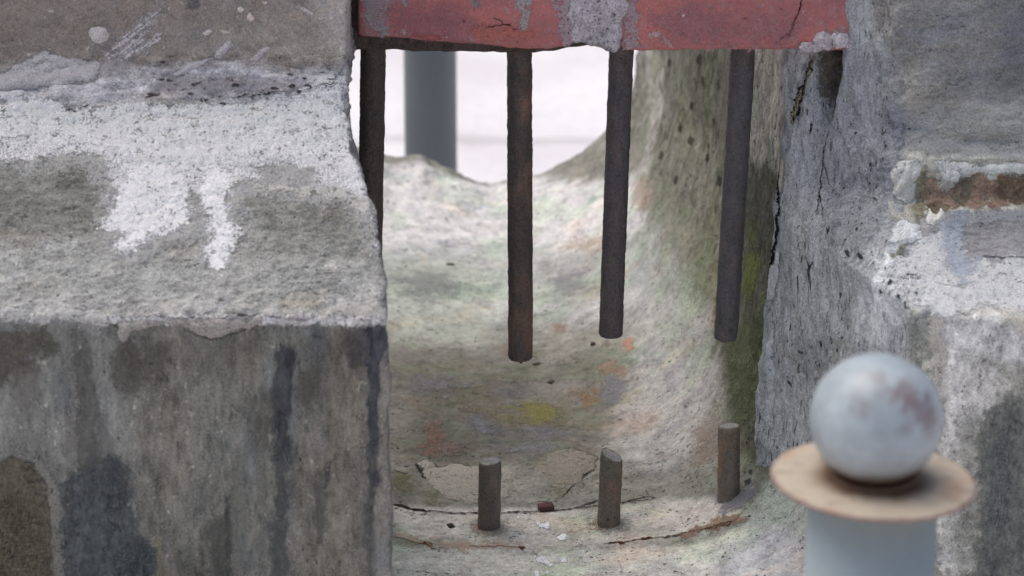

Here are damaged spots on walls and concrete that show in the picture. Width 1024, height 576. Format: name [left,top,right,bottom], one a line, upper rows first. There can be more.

crack [781,0,802,39]
damp [0,70,382,283]
crack [790,56,834,215]
spalling [850,124,1024,225]
damp [0,309,109,388]
damp [55,349,160,576]
damp [265,301,388,576]
crack [393,504,478,514]
crack [504,496,653,513]